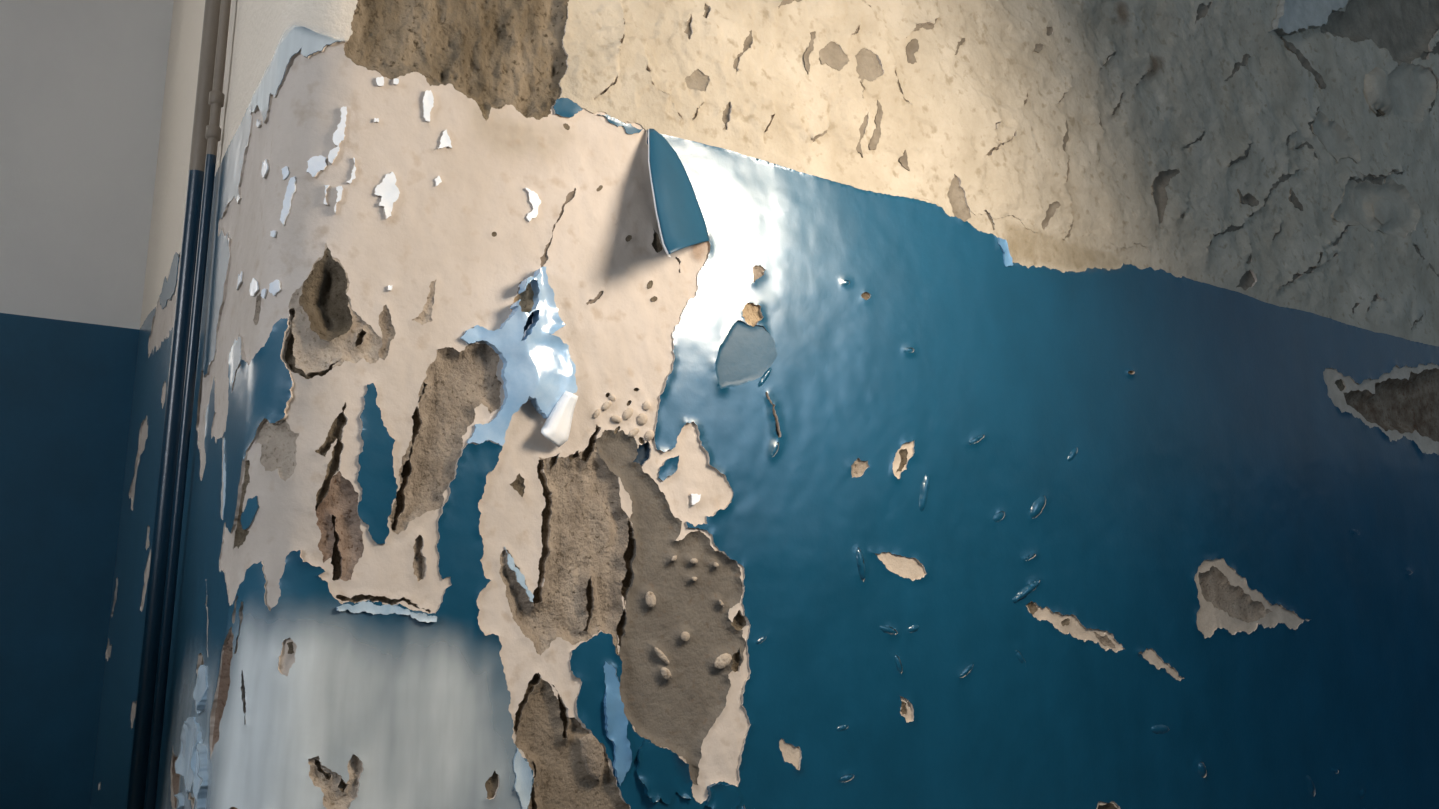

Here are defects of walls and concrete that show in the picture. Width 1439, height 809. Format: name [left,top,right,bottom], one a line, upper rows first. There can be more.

crack [906,19,965,55]
crack [1421,28,1439,113]
crack [987,52,1149,182]
crack [1214,36,1327,264]
crack [1349,170,1403,185]
crack [1286,226,1348,285]
peeling [198,0,750,809]
flaking render [1323,363,1439,455]
peeling [875,552,925,581]
peeling [1194,558,1308,638]
peeling [1026,602,1184,681]
peeling [172,630,234,809]